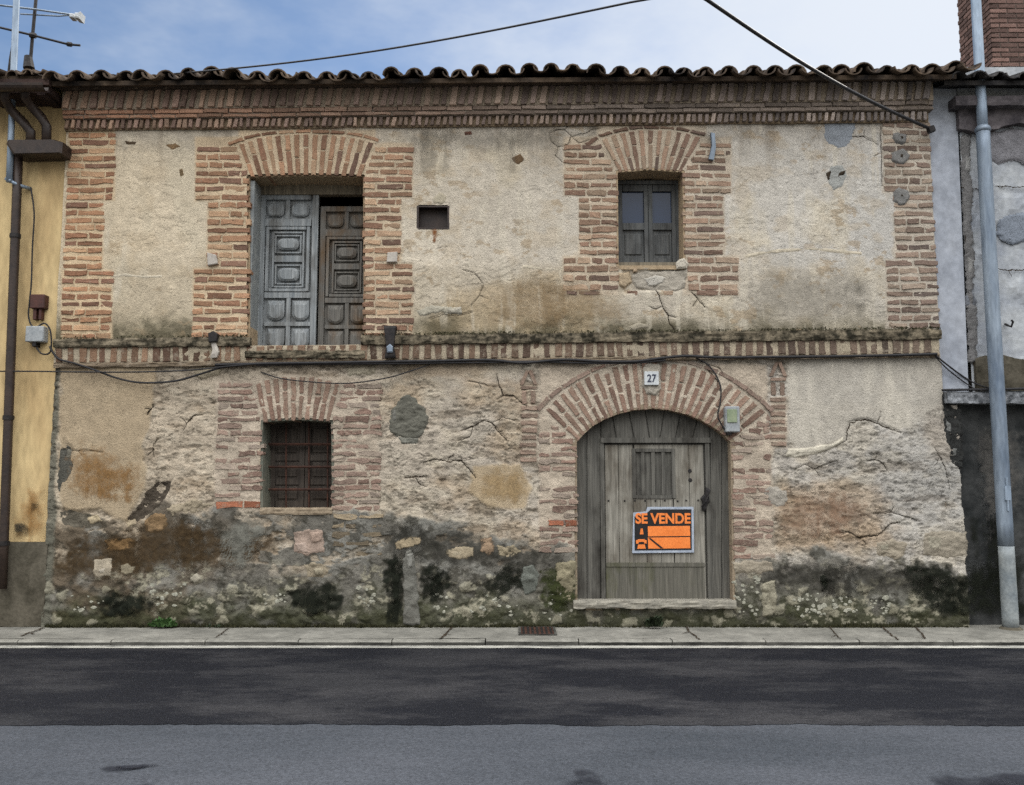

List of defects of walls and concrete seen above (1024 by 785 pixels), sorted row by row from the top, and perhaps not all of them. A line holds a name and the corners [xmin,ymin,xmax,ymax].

crack [648,291,705,331]
crack [405,377,527,487]
flaking render [786,437,843,458]
mould [96,591,153,617]
damp [56,521,272,574]
mould [288,581,344,616]
damp [383,528,577,623]
crack [836,508,920,542]
damp [765,518,1001,617]
flaking render [922,531,969,558]
damp [1015,561,1024,613]